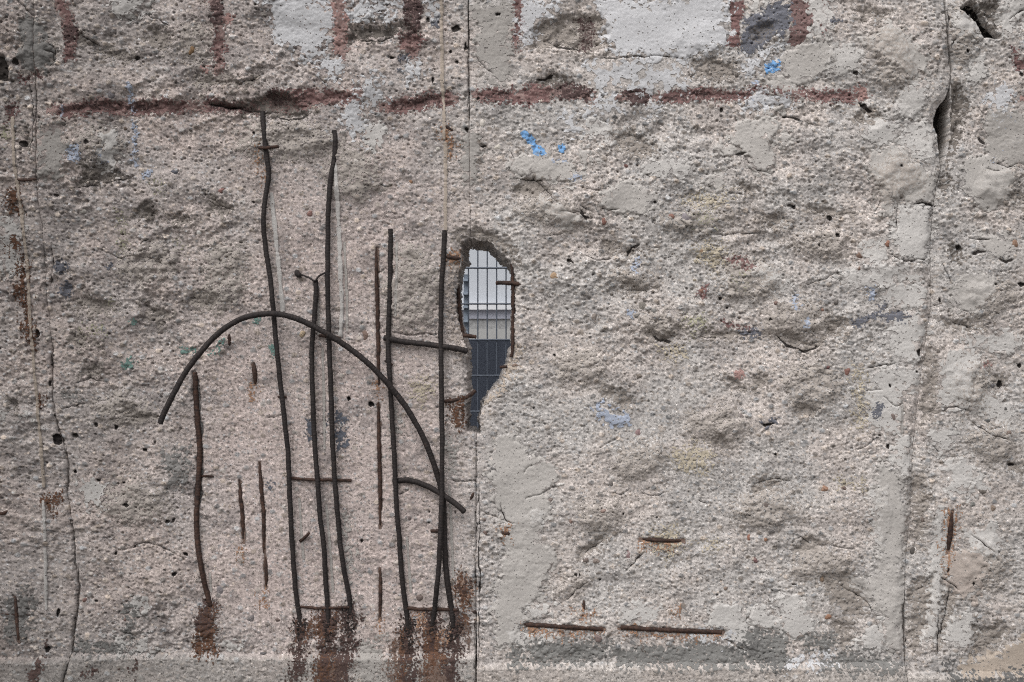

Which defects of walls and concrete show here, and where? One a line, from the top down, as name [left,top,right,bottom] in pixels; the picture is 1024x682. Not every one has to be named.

crack [947,6,994,65]
rust [435,123,463,160]
crack [971,238,1013,272]
spalling [46,0,526,629]
rust [445,395,469,436]
rust [936,504,963,578]
rust [186,593,224,665]
rust [280,564,479,682]
rust [520,603,728,646]
crack [937,578,957,653]